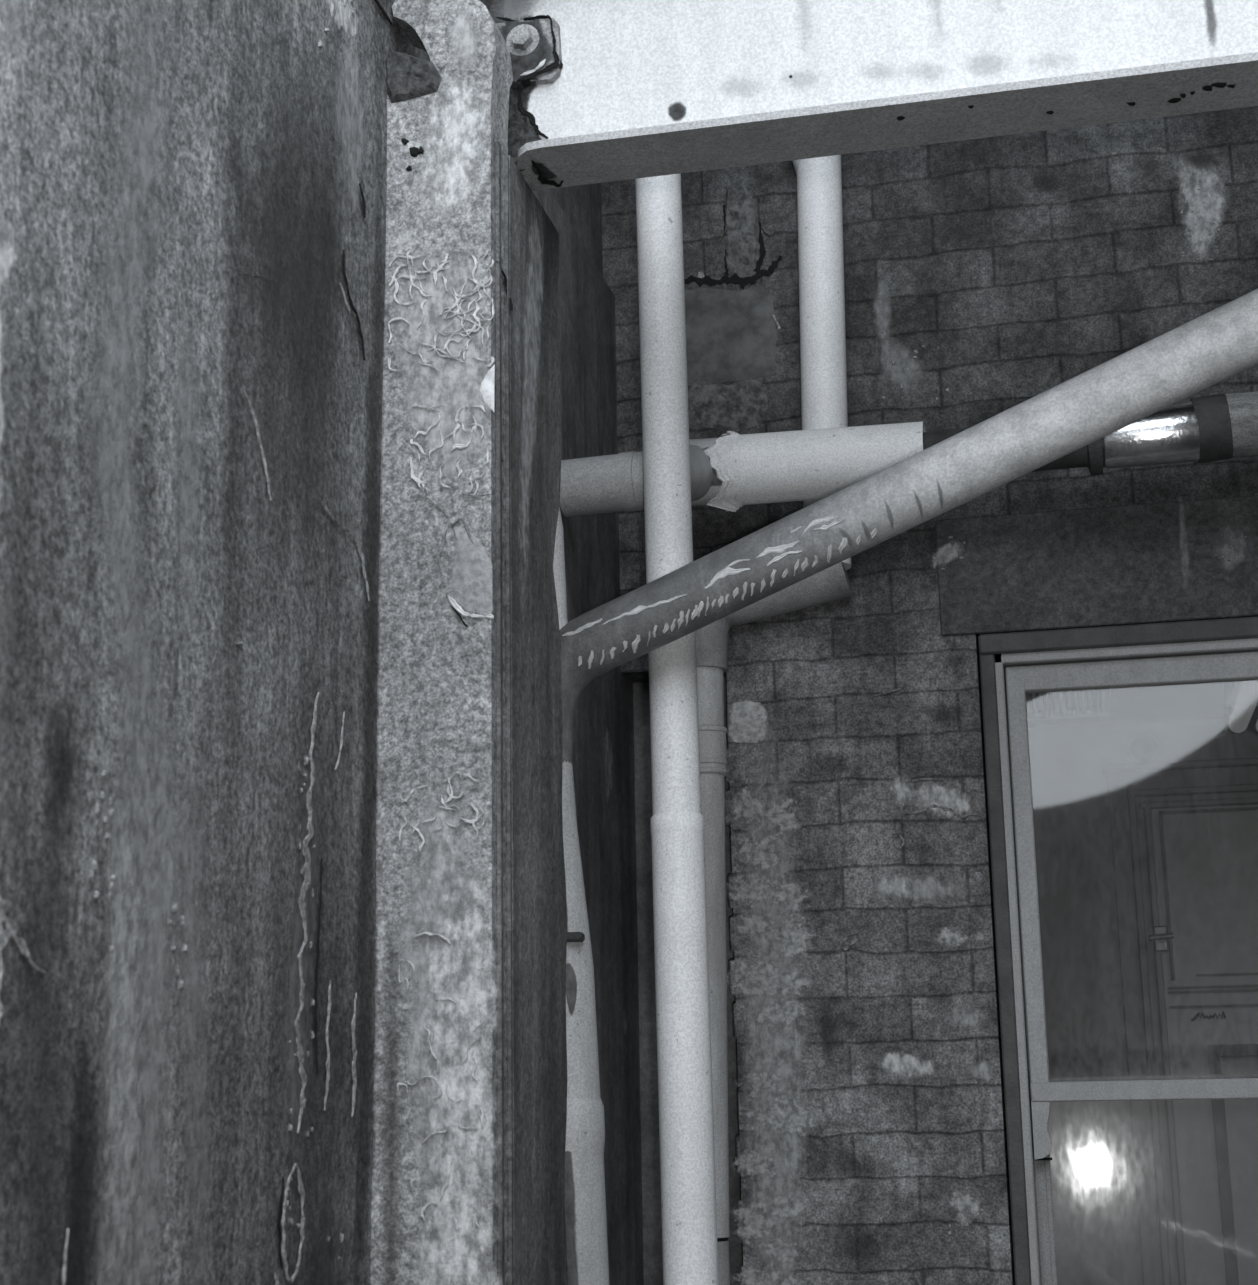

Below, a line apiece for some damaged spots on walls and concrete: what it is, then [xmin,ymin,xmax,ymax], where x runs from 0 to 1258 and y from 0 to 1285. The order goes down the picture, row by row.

crack [374,0,392,24]
rust [1206,0,1216,39]
rust [1167,82,1236,103]